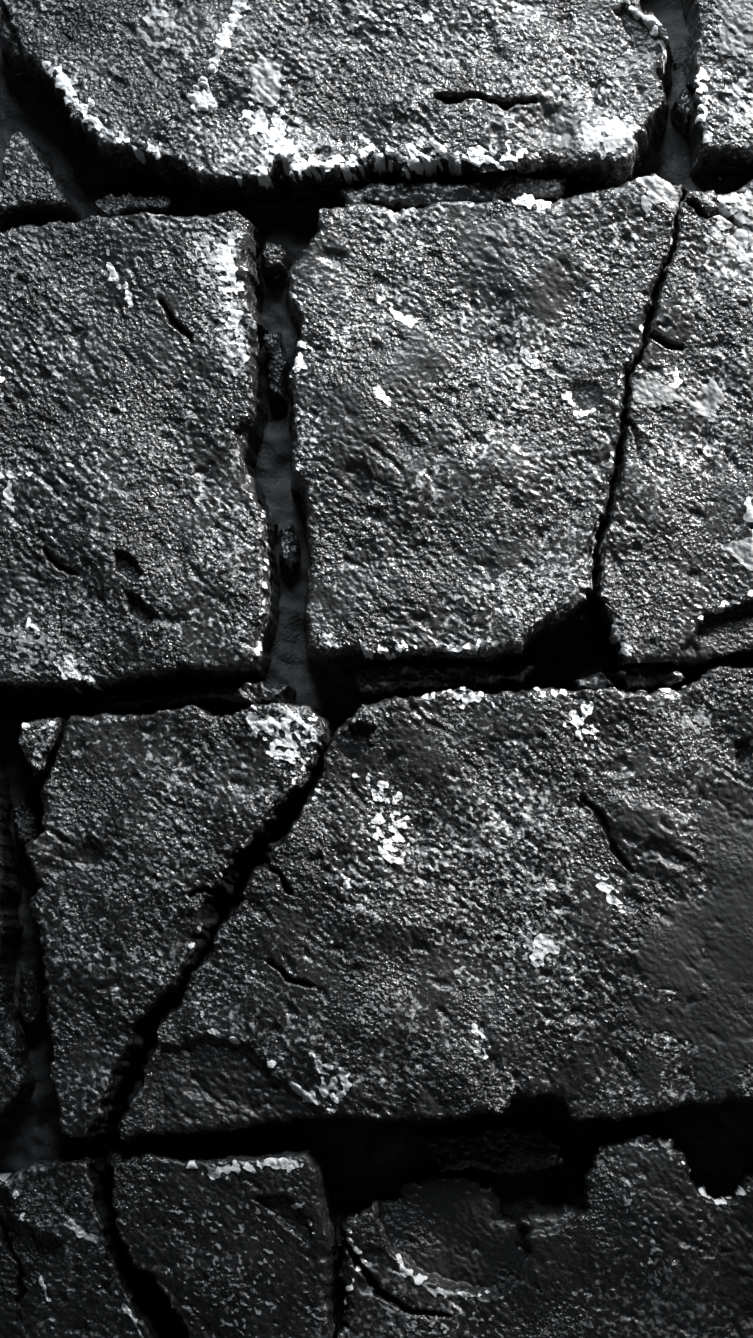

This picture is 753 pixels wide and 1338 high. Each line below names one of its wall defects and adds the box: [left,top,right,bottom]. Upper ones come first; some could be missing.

crack [589,194,738,614]
crack [90,730,336,1338]